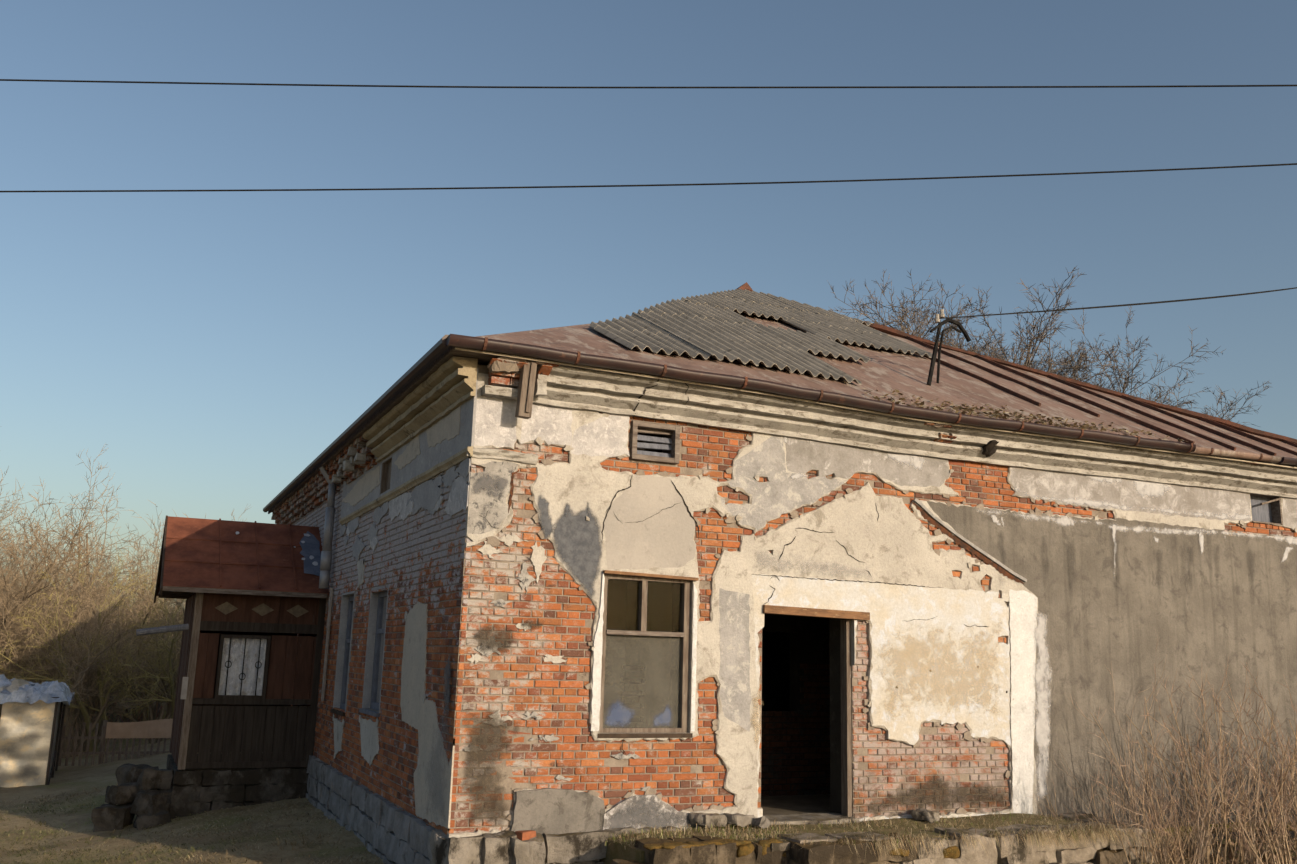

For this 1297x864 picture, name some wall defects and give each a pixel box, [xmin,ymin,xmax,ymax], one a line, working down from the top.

flaking render [340,405,484,589]
crack [601,477,699,539]
flaking render [600,416,1114,621]
flaking render [333,714,379,766]
water stain [465,712,519,822]
water stain [476,621,542,652]
flaking render [400,437,736,834]
flaking render [851,620,1010,818]